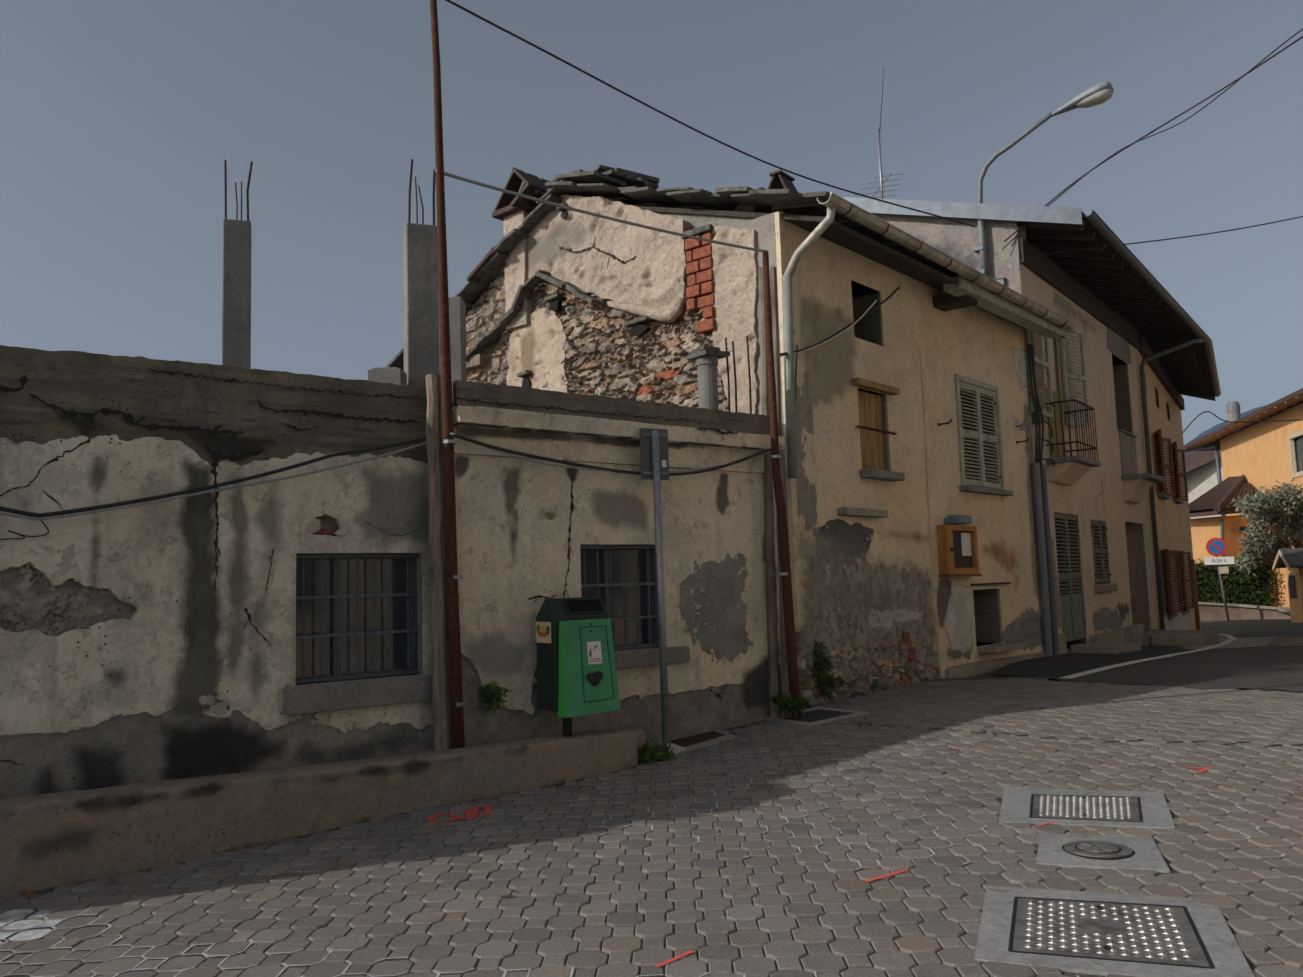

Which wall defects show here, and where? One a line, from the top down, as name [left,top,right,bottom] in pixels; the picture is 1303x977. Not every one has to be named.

crack [559,237,636,269]
spalling [466,224,716,408]
leakage [92,458,105,487]
spalling [308,515,345,536]
crack [0,368,738,602]
spalling [0,562,136,637]
leakage [77,464,282,810]
crack [244,550,273,645]
flaking render [678,553,754,663]
flaking render [795,519,973,707]
leakage [1093,598,1136,632]
flaking render [449,656,781,749]